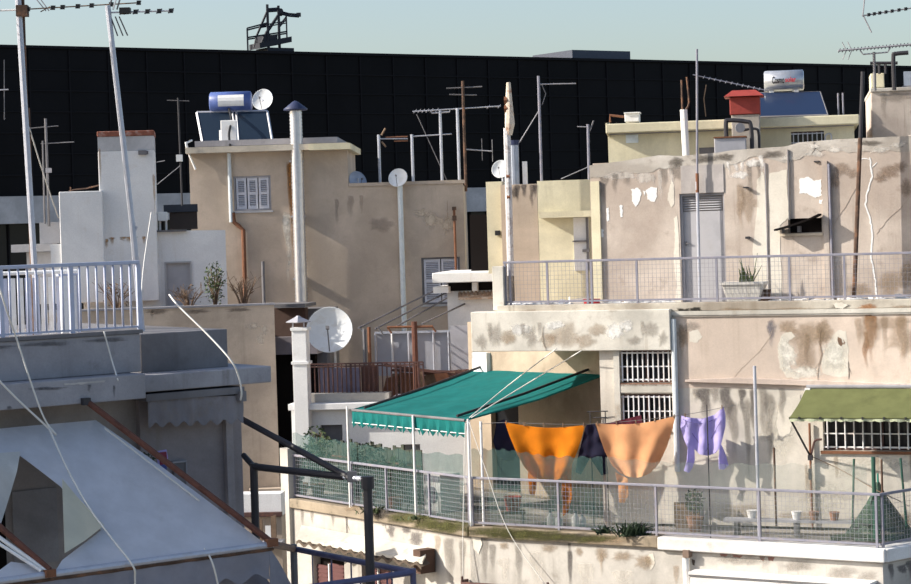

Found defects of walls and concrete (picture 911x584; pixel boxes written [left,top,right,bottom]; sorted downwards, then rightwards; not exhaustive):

peeling [601,187,657,237]
peeling [668,179,681,302]
peeling [752,169,788,300]
peeling [799,177,822,204]
leakage [606,321,631,339]
flaking render [778,332,800,380]
flaking render [821,330,849,377]
leakage [698,389,709,409]
leakage [721,389,754,417]